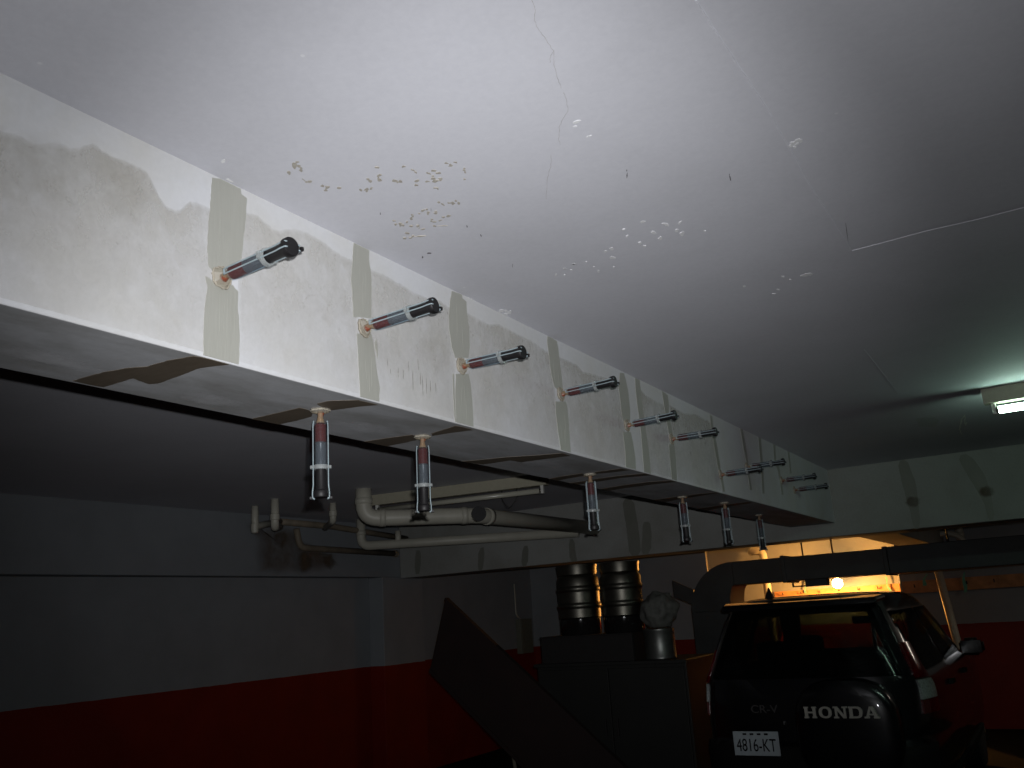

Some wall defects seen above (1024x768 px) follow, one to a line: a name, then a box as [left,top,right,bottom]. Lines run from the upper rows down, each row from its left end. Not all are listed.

peeling [359,161,466,239]